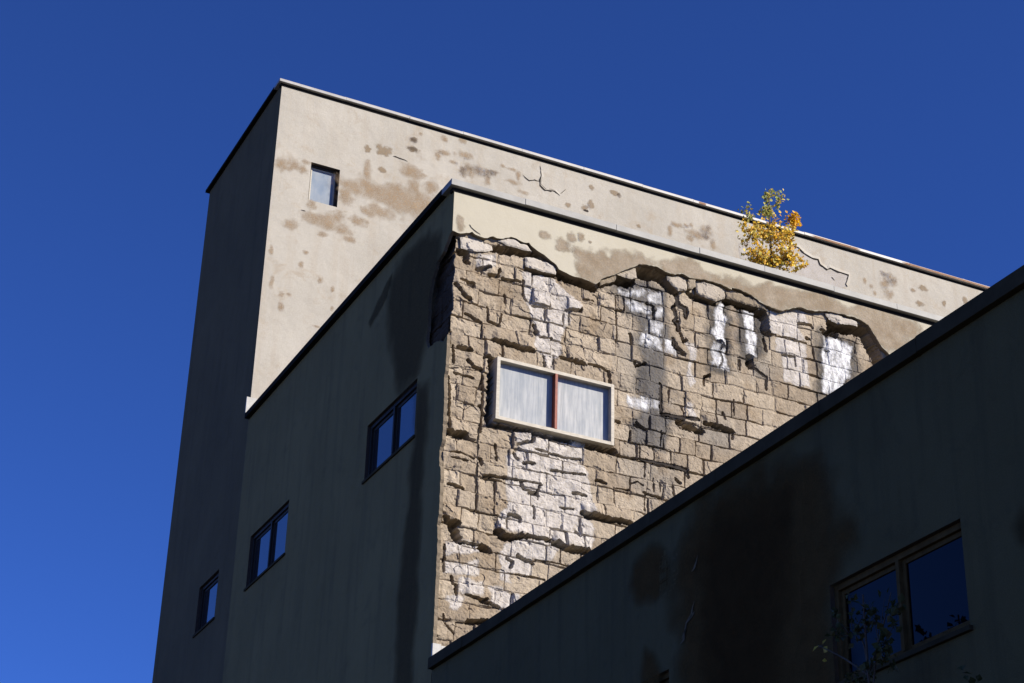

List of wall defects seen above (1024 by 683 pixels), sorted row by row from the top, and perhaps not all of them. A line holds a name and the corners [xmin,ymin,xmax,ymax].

water stain [308,145,435,241]
crack [523,167,566,195]
crack [788,240,850,286]
spalling [429,234,922,646]